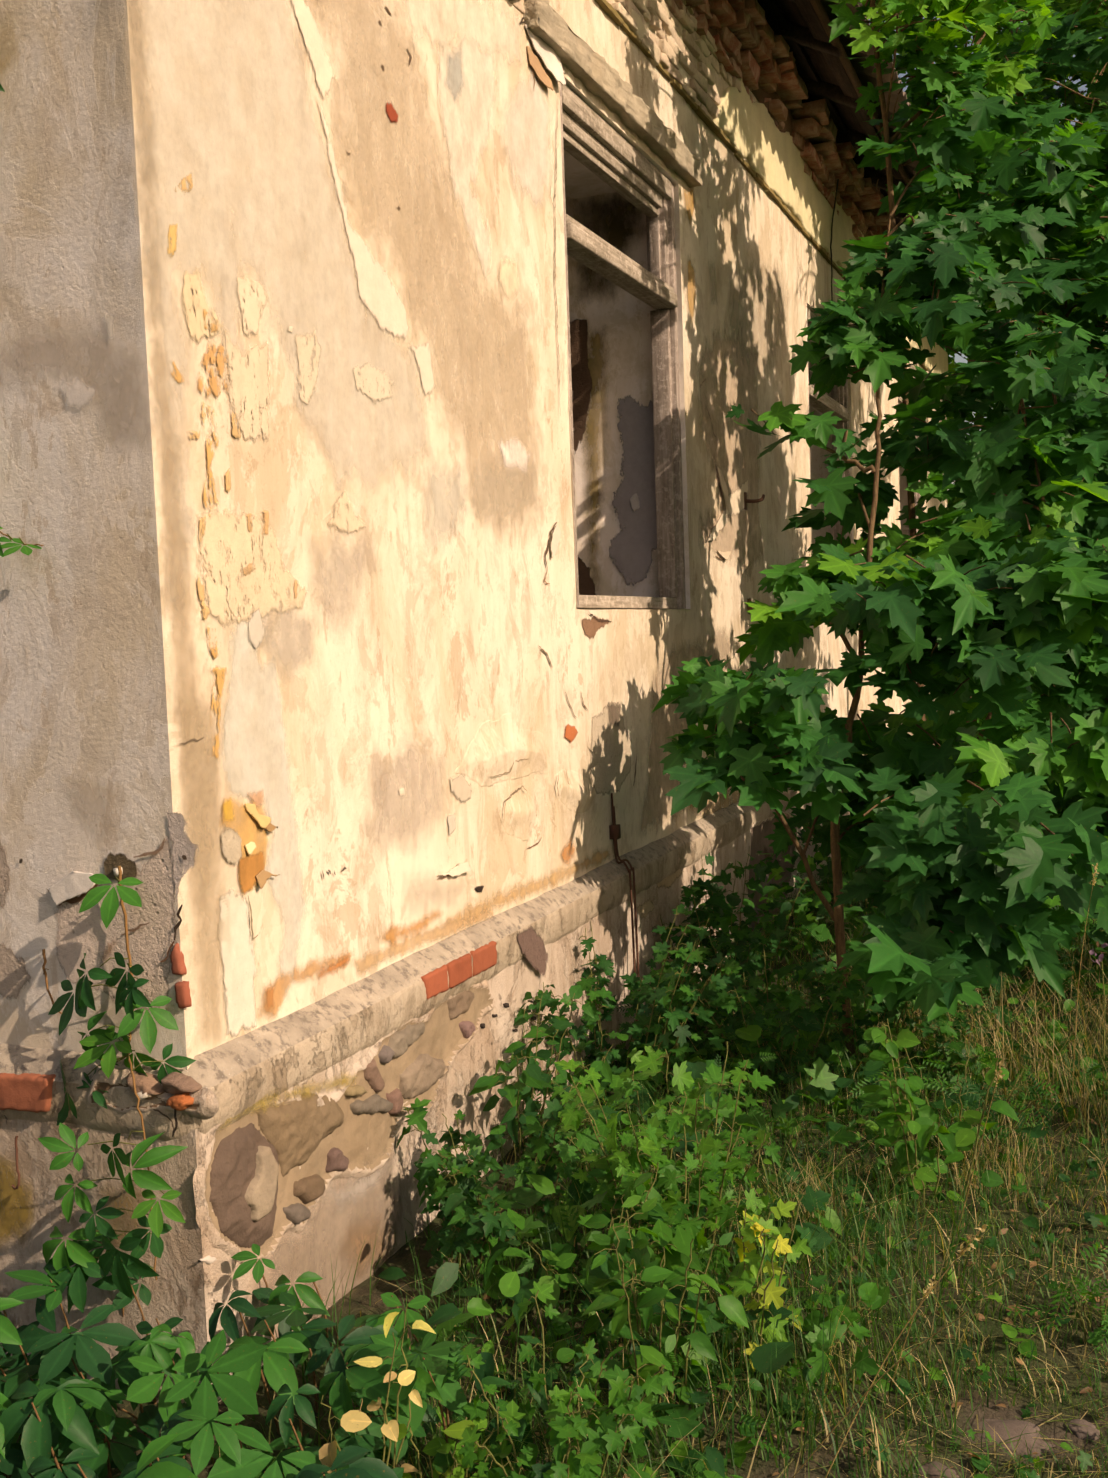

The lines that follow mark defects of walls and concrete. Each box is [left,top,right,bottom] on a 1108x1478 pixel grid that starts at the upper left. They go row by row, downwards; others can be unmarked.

flaking render [508,0,566,91]
flaking render [606,0,741,119]
leakage [407,0,549,297]
peeling [140,0,435,991]
flaking render [699,330,763,569]
flaking render [564,630,729,830]
flaking render [0,847,23,907]
flaking render [0,943,30,998]
spalling [88,941,509,1264]
leakage [0,1161,33,1241]
leakage [107,1192,140,1244]